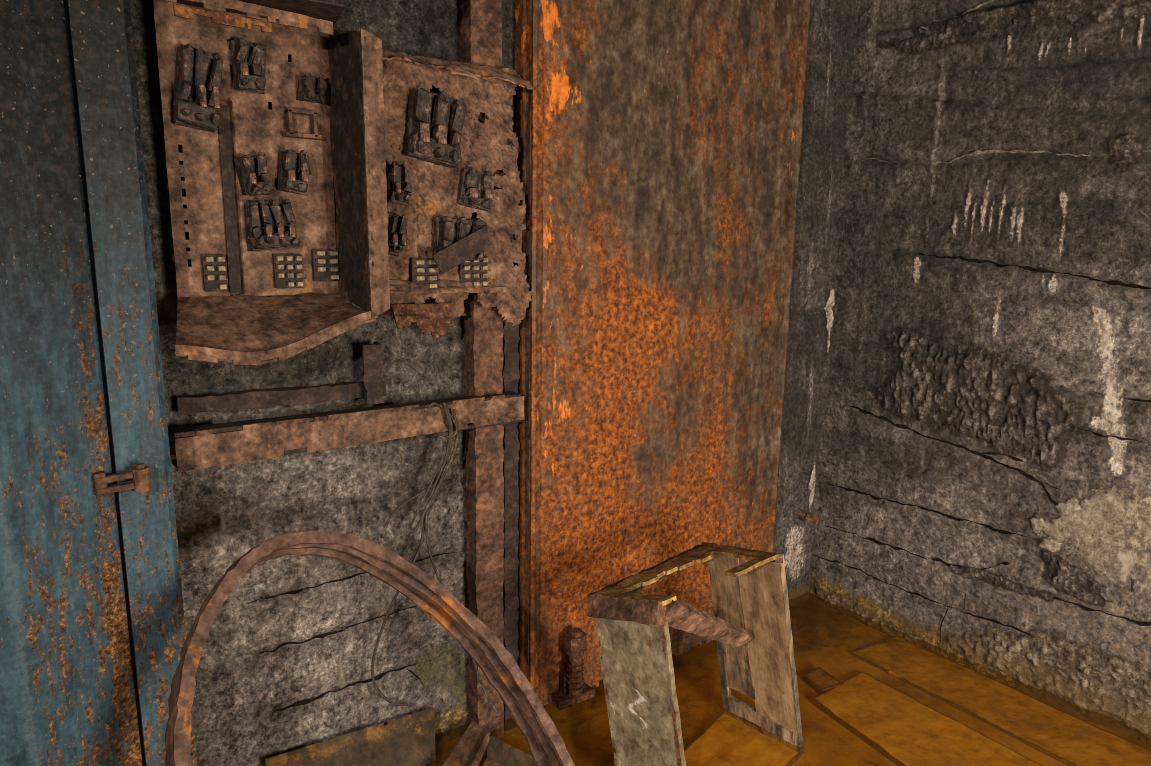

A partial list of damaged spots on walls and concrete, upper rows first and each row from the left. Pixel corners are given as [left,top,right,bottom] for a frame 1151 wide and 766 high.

crack [863,0,994,37]
crack [863,150,1113,163]
crack [918,253,1151,289]
damp [1091,306,1127,475]
crack [848,405,1062,505]
crack [827,483,1040,541]
crack [248,572,366,604]
crack [260,606,417,654]
crack [813,526,1032,642]
crack [1053,596,1151,626]
crack [274,653,449,712]